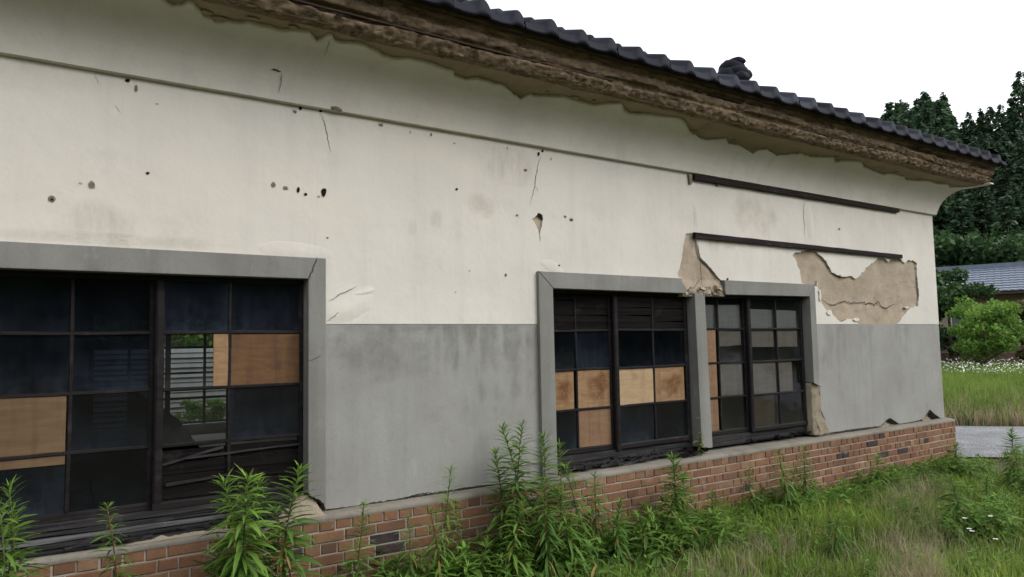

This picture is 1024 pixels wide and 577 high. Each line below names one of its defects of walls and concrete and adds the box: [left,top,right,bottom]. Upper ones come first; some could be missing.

flaking render [167,0,983,186]
spalling [532,214,543,239]
spalling [677,233,729,297]
spalling [793,250,918,324]
spalling [119,494,326,547]